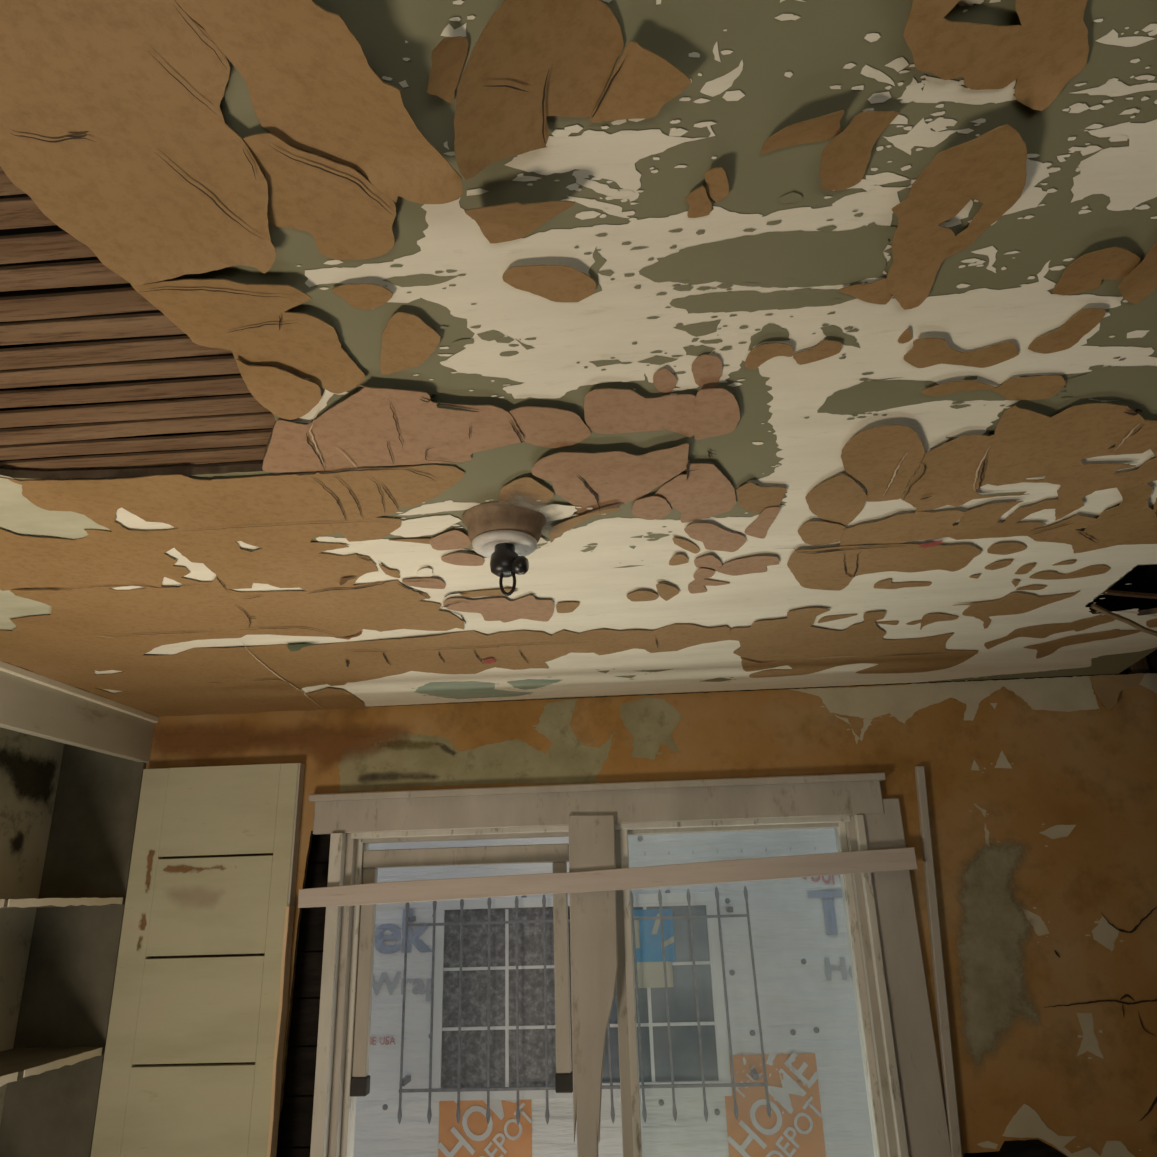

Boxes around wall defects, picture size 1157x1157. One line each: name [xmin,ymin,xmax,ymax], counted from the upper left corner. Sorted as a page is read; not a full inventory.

flaking render [0,0,1157,792]
crack [186,394,479,531]
crack [973,447,990,490]
crack [577,476,600,510]
leakage [0,749,56,803]
flaking render [1039,824,1076,847]
peeling [957,803,1050,1065]
flaking render [1085,916,1123,951]
crack [1102,907,1157,933]
flaking render [1077,1013,1104,1059]
crack [1044,994,1157,1036]
flaking render [977,1104,1141,1157]